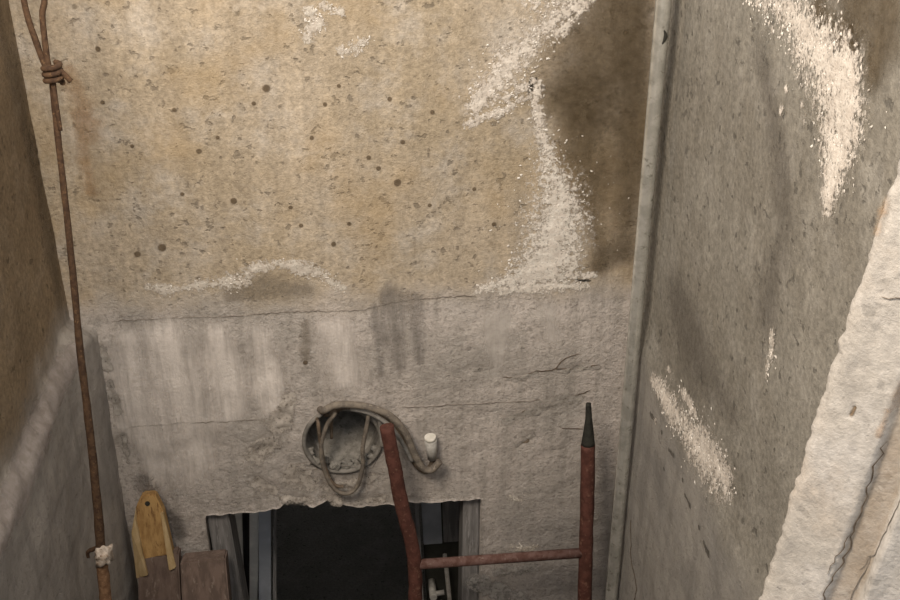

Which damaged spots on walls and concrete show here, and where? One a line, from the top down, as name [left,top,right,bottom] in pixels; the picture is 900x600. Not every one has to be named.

water stain [458,0,646,303]
water stain [743,0,898,217]
water stain [111,318,284,486]
water stain [144,258,346,299]
water stain [321,316,358,388]
water stain [650,365,737,505]
crack [823,443,900,600]